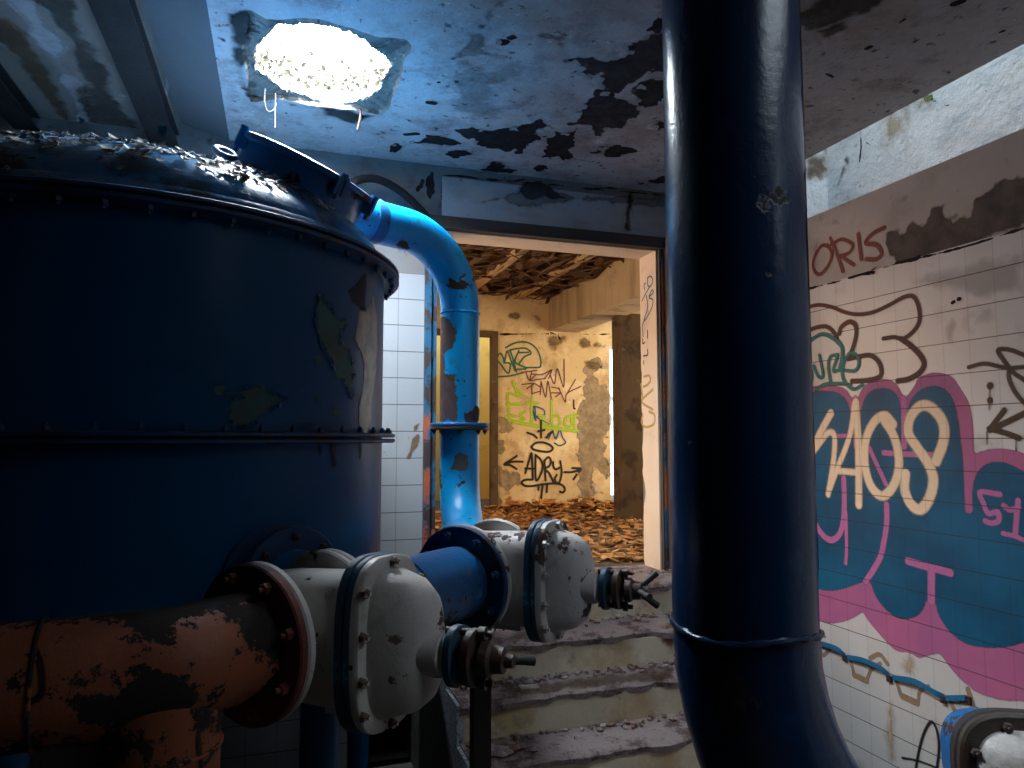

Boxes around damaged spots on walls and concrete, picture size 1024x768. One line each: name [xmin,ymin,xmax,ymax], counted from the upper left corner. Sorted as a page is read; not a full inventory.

spalling [389,12,664,175]
peeling [416,172,442,200]
spalling [639,176,665,186]
peeling [576,357,613,502]